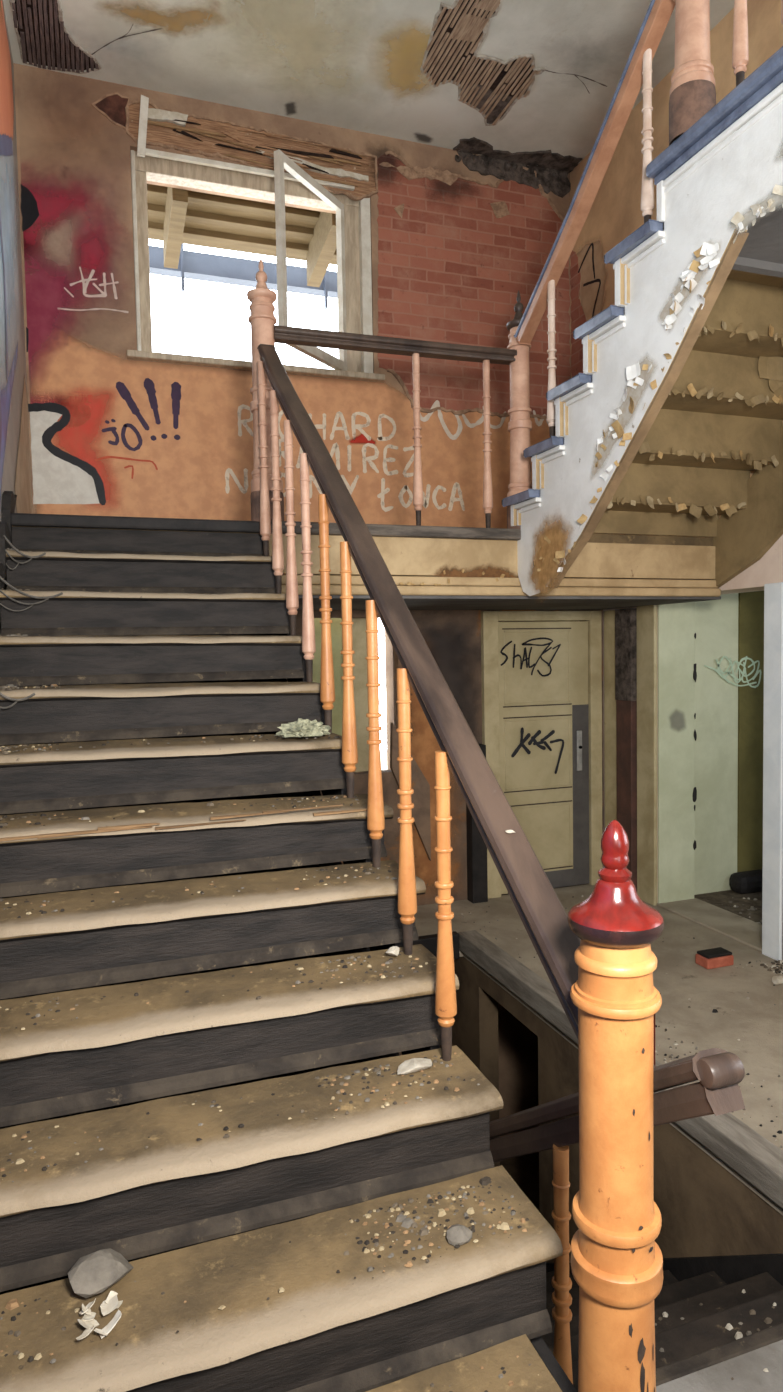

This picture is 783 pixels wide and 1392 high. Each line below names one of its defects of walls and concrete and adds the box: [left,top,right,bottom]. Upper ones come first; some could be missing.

flaking render [9,0,102,74]
damp [387,29,429,91]
flaking render [91,92,129,130]
flaking render [147,108,188,127]
flaking render [256,0,583,418]
peeling [436,184,783,595]